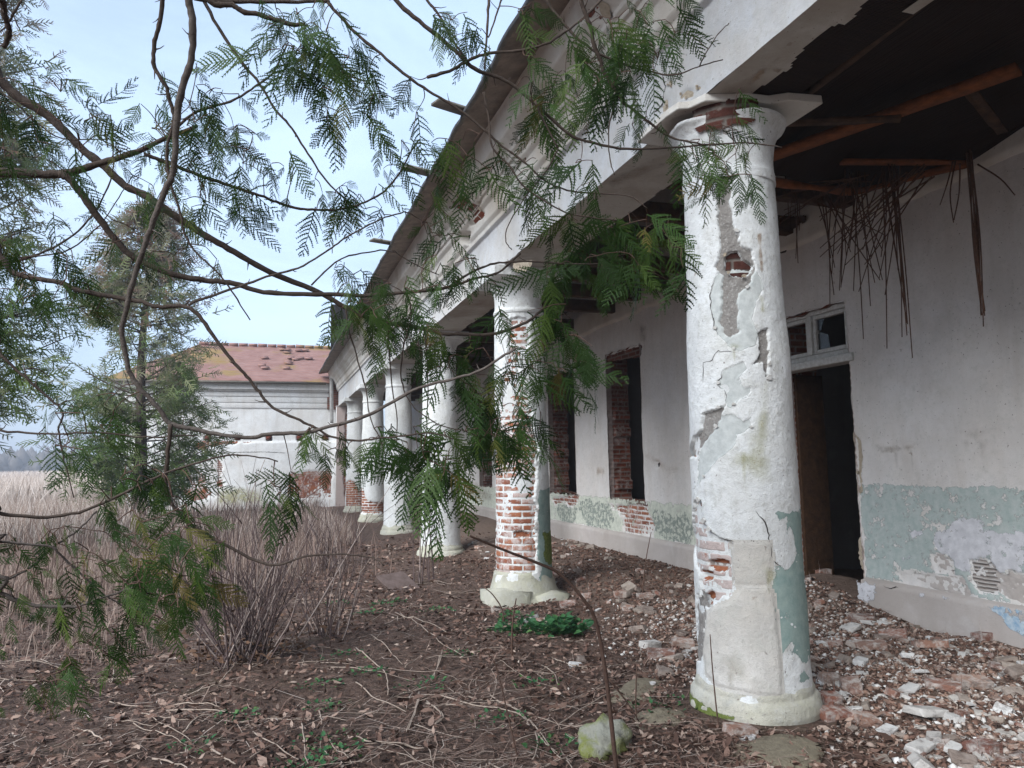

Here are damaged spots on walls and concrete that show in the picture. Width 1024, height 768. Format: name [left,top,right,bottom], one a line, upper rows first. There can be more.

spalling [460,177,772,661]
crack [703,283,735,400]
peeling [772,509,810,663]
peeling [853,433,1024,636]